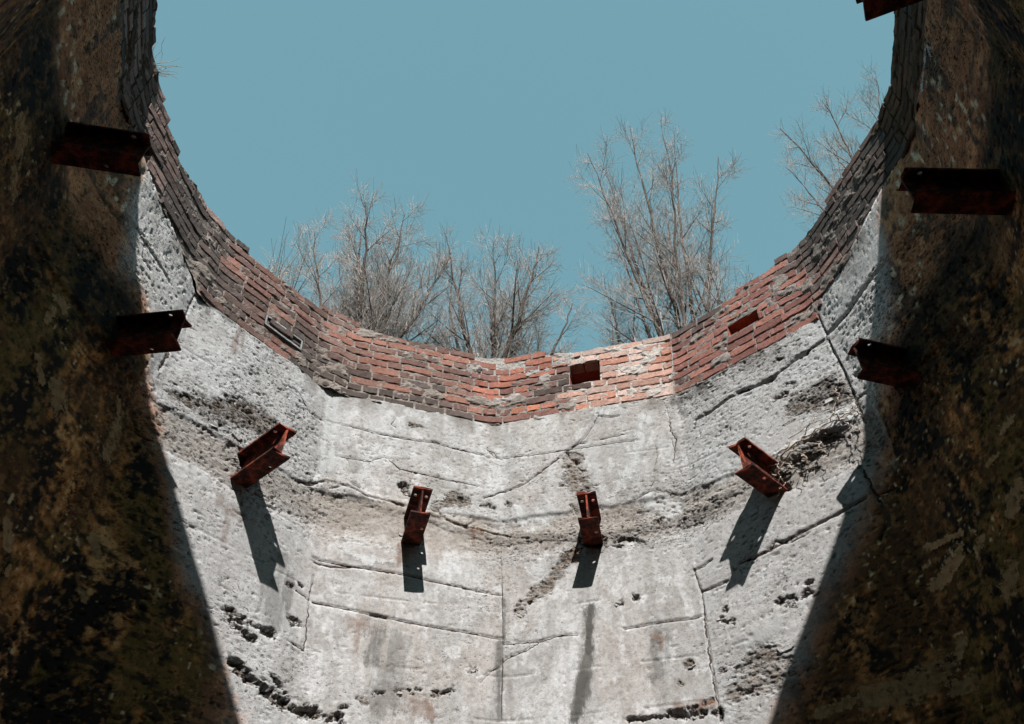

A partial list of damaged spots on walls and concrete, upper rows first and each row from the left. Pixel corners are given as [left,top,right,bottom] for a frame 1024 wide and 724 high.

spalling [765,373,860,426]
crack [819,316,864,419]
spalling [772,427,851,492]
spalling [222,606,277,644]
spalling [286,614,304,628]
spalling [226,656,455,724]
damp [571,603,596,724]
crack [695,560,729,723]